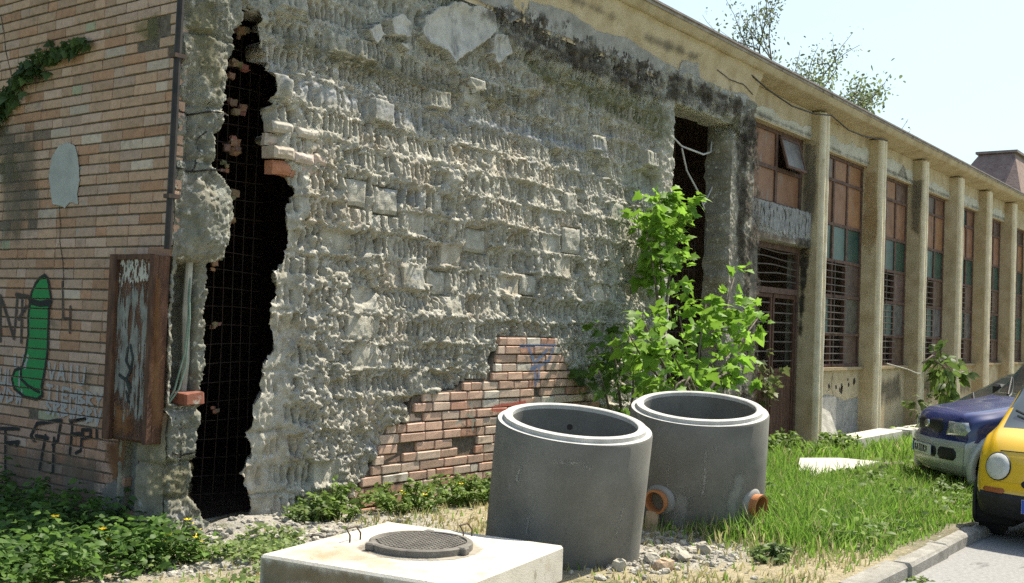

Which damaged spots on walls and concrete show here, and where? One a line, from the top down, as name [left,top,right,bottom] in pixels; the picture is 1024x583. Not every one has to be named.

spalling [114,0,812,543]
water stain [487,6,772,145]